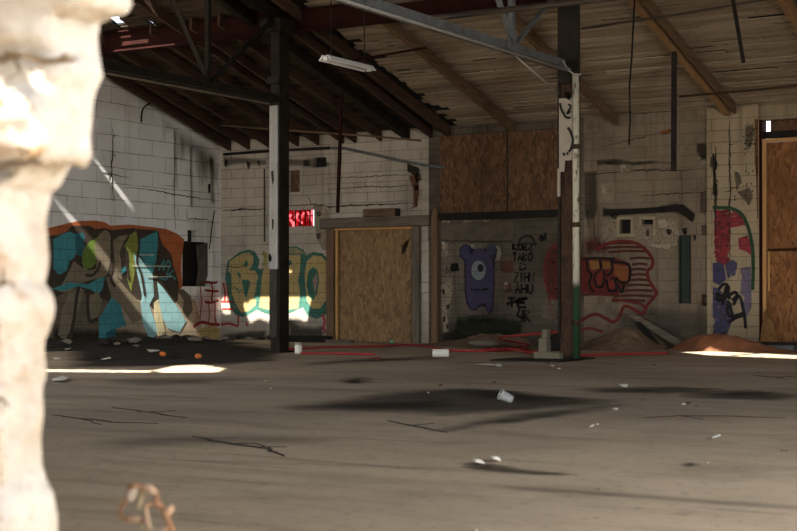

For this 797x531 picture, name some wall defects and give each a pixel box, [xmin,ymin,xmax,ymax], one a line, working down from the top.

crack [104,135,263,229]
damp [181,138,214,202]
spalling [407,164,421,190]
crack [582,121,743,258]
peeling [731,170,754,204]
crack [55,407,187,425]
crack [192,436,285,456]